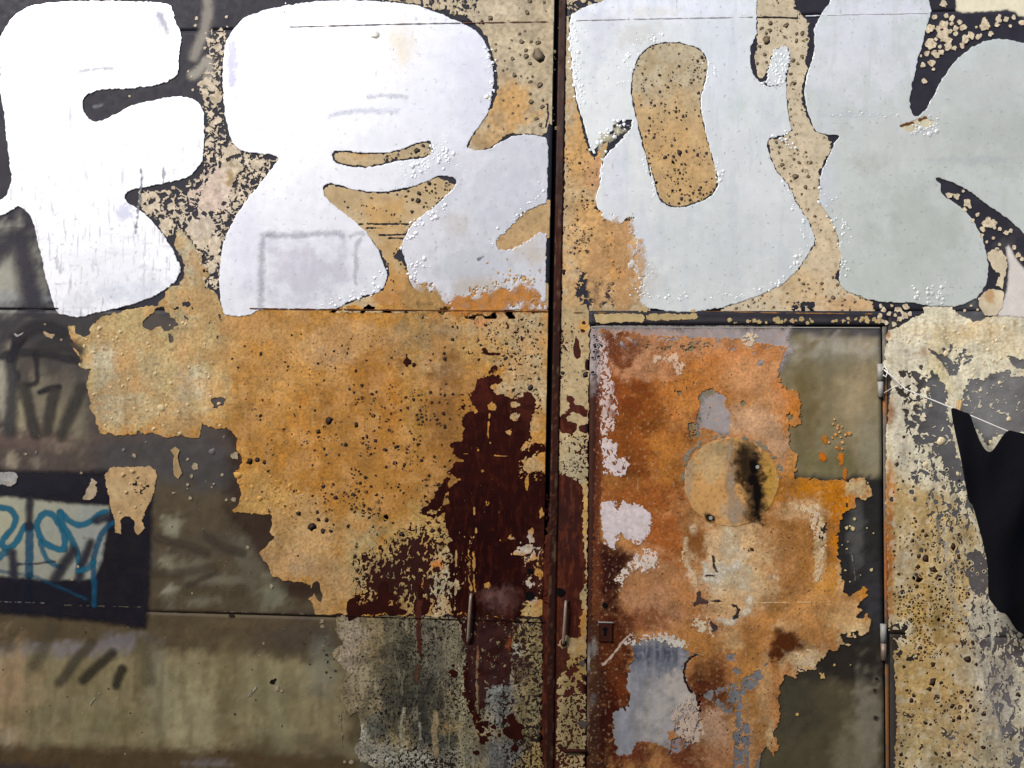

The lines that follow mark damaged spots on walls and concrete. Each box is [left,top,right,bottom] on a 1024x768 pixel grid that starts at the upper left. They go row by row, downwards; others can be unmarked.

peeling [43,0,554,768]
rust [334,600,477,767]
rust [560,322,872,768]
peeling [553,0,1024,768]